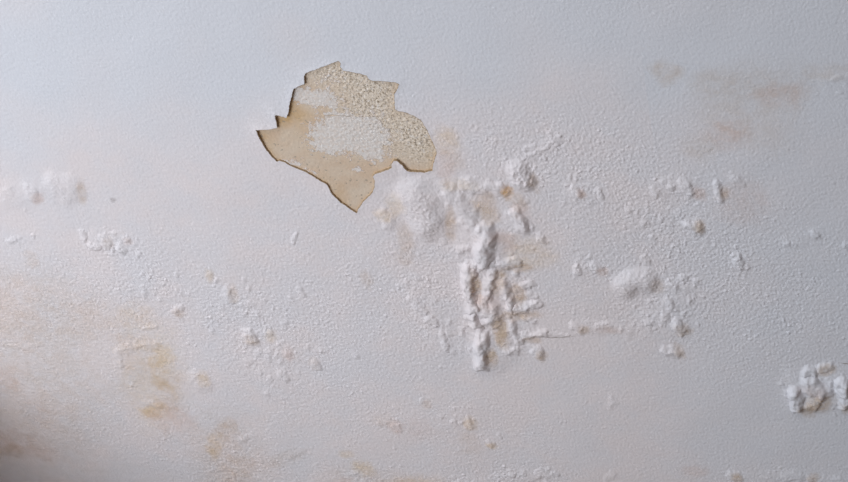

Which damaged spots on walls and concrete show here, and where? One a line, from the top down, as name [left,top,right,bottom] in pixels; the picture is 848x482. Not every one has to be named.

peeling [256,61,437,213]